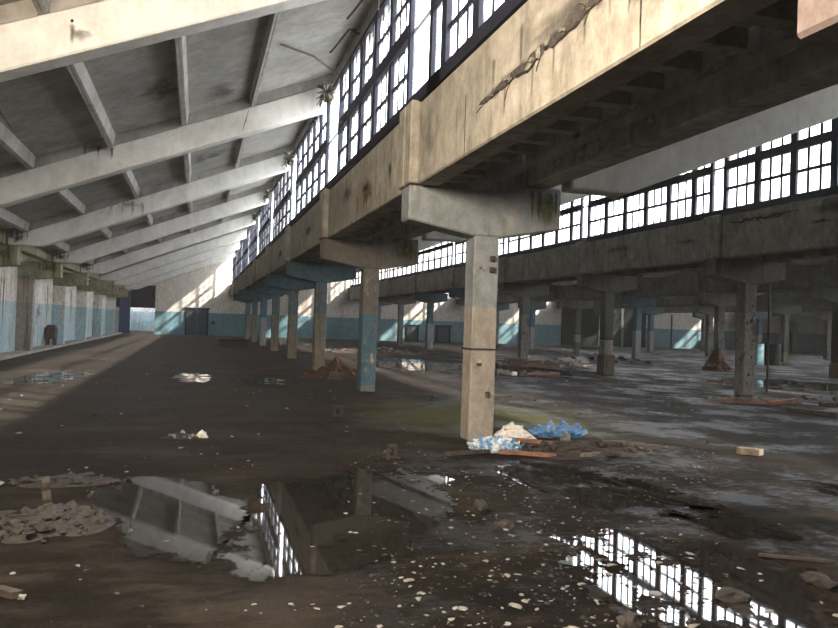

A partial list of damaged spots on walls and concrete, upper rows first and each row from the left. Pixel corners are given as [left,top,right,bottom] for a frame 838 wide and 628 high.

crack [464,0,602,152]
crack [636,2,644,47]